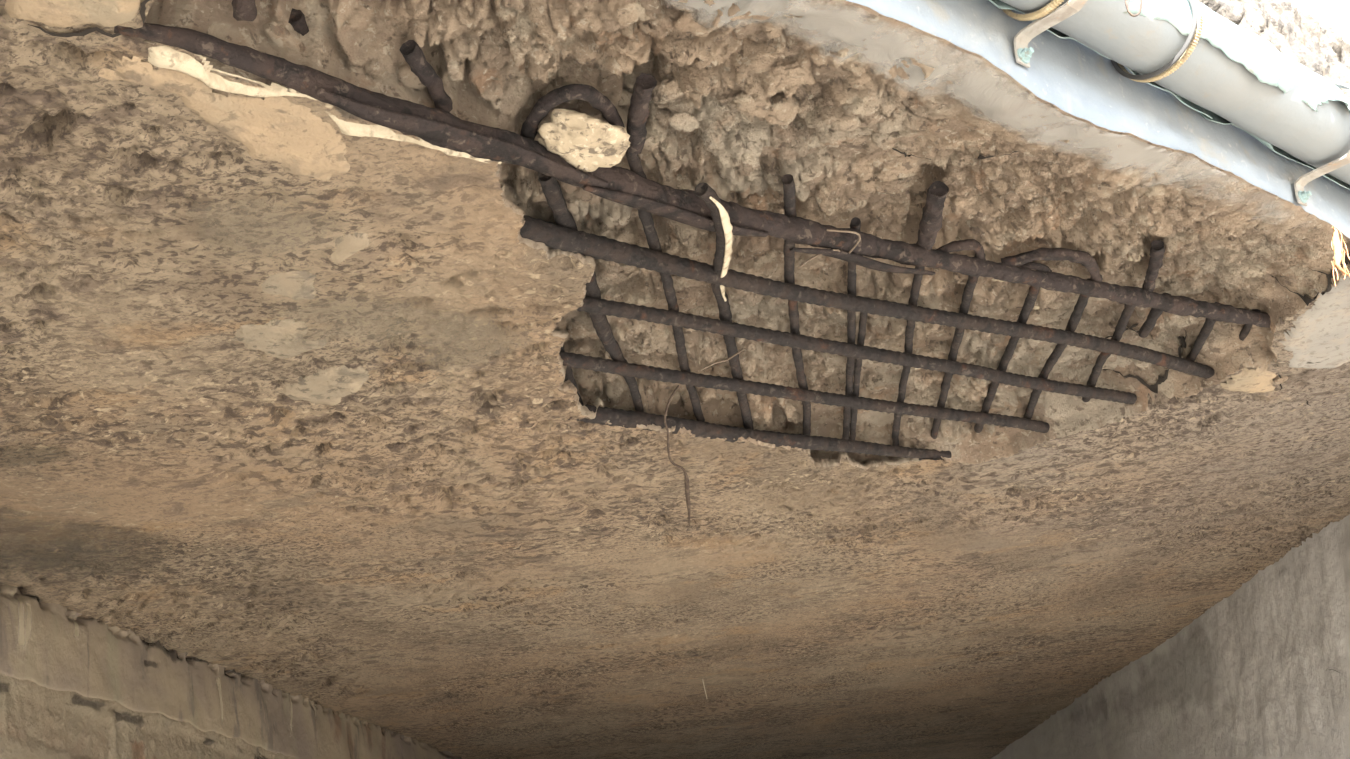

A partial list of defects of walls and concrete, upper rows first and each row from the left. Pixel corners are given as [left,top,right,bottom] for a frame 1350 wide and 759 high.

spalling [114,0,1350,470]